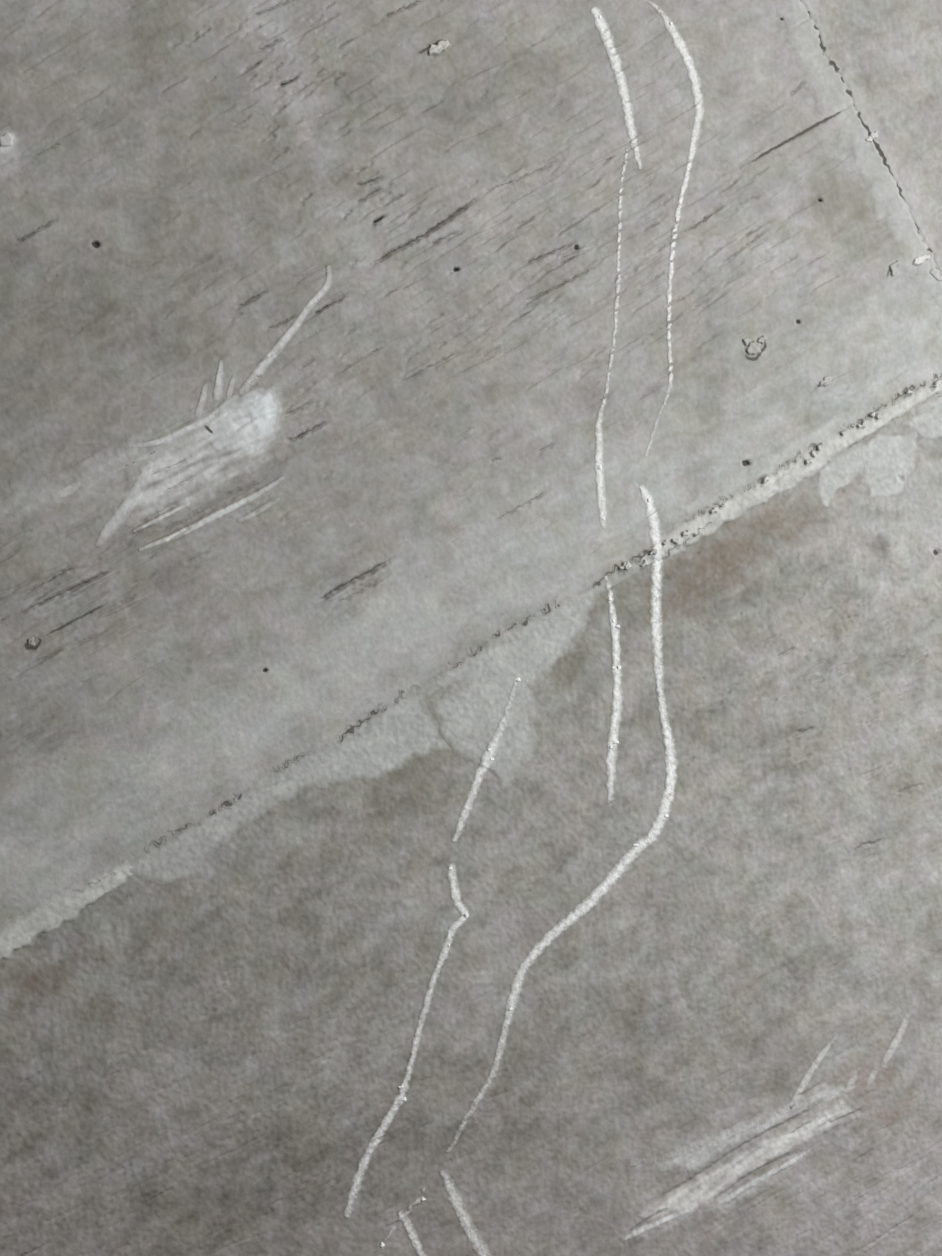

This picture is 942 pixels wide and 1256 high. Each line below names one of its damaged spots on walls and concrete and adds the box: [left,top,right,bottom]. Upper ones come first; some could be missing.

crack [376,0,425,20]
crack [680,0,942,281]
crack [232,154,572,333]
crack [514,239,613,306]
crack [391,347,469,389]
crack [487,484,557,525]
crack [307,552,403,608]
damp [533,485,832,701]
damp [866,531,893,564]
damp [362,748,461,874]